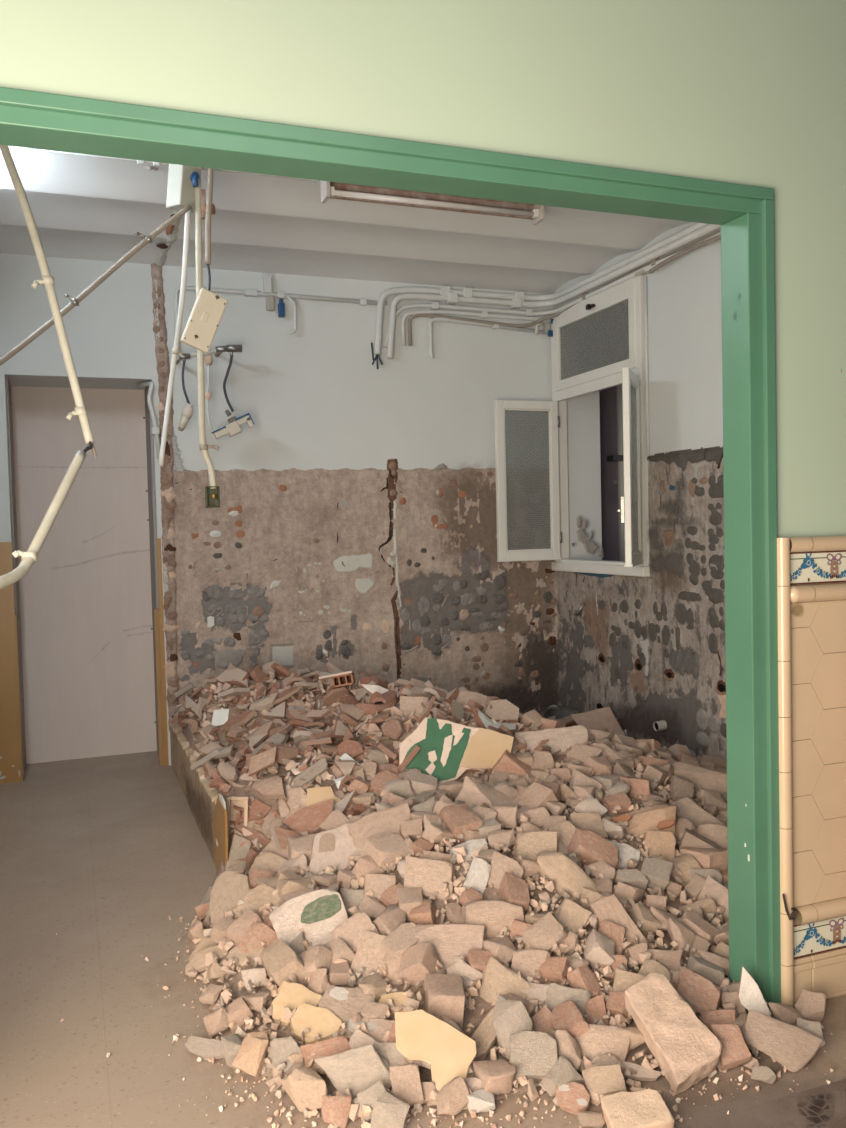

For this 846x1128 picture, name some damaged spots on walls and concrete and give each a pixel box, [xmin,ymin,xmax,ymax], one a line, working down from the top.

crack [378,459,402,680]
flaking render [173,446,728,1072]